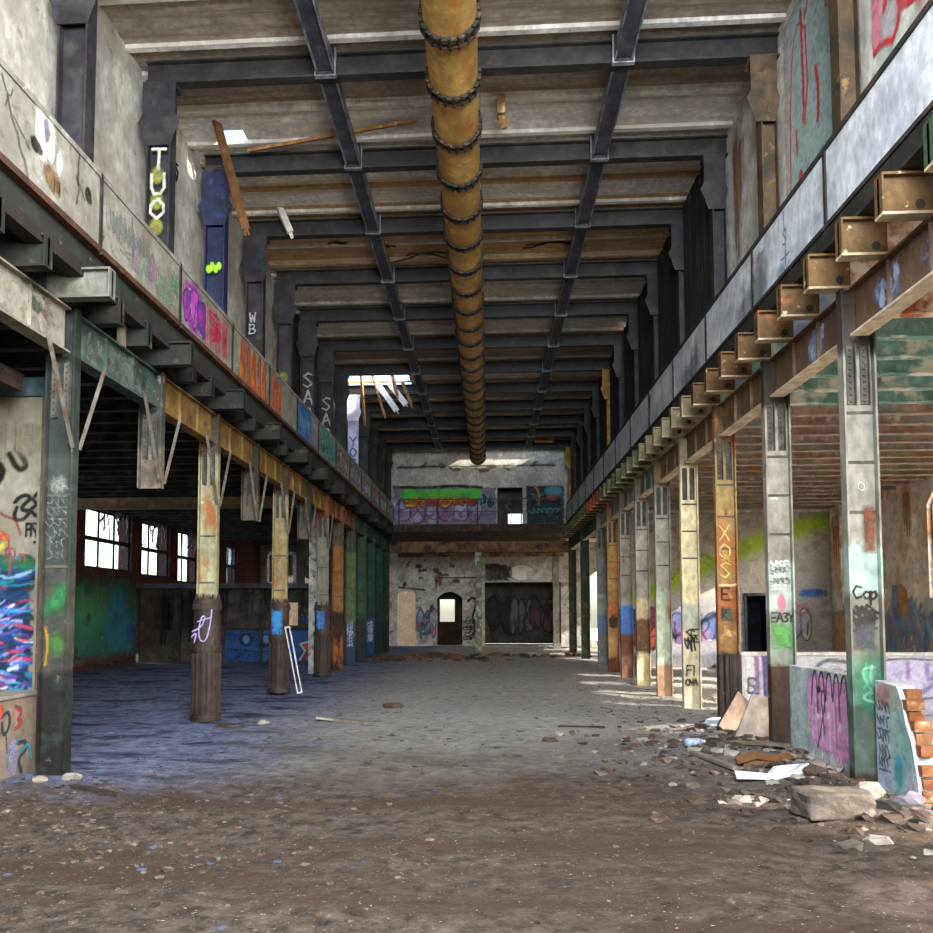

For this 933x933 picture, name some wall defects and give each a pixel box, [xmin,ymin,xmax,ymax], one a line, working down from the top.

peeling [875,262,899,309]
peeling [808,323,824,362]
spalling [901,688,933,806]